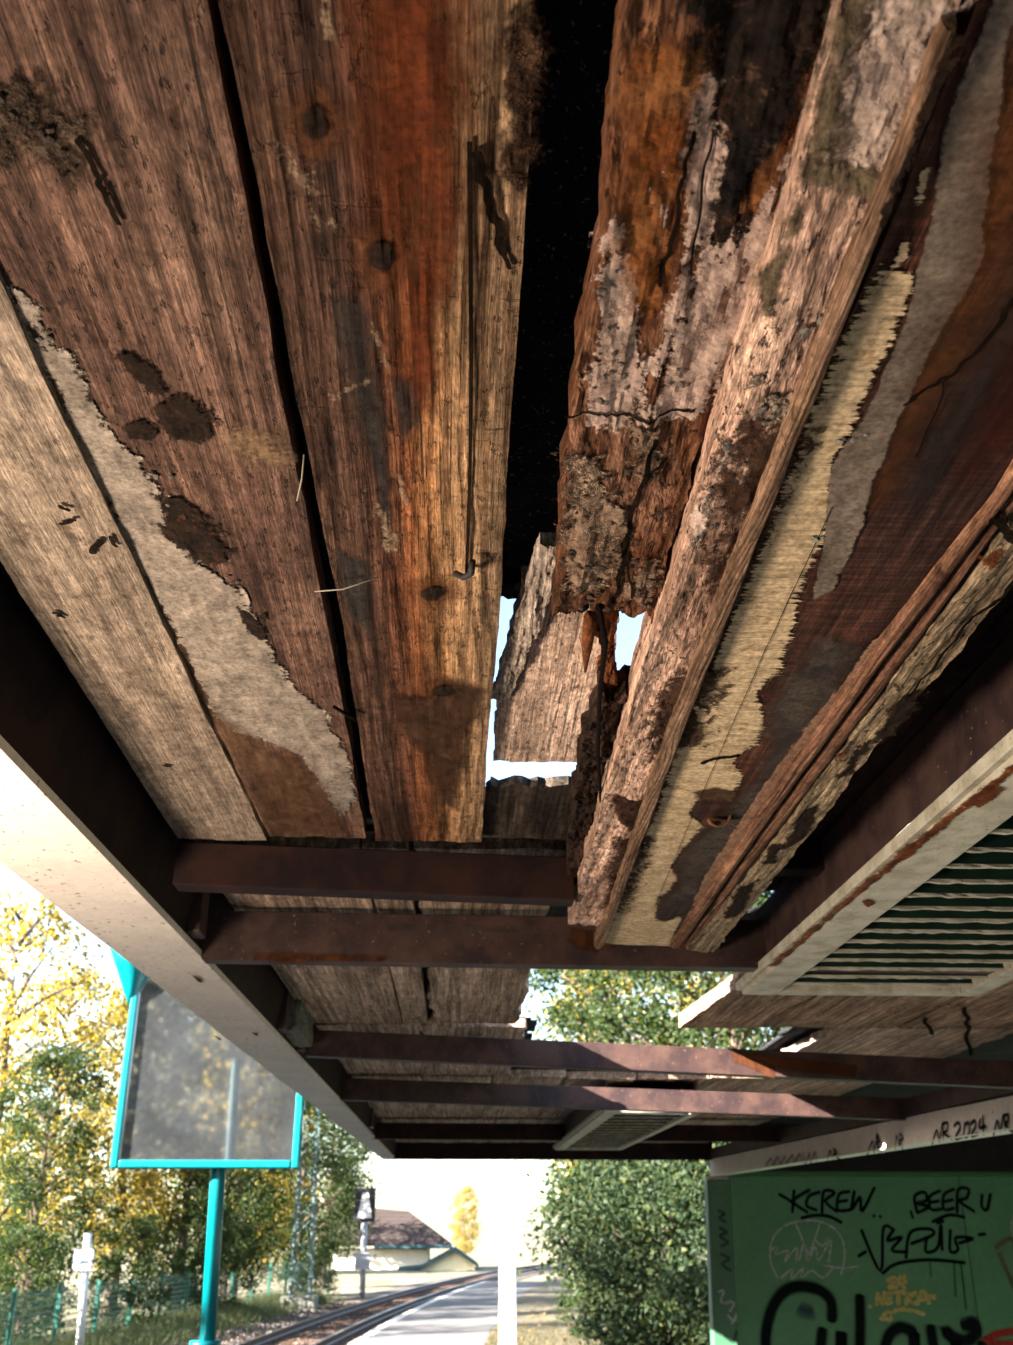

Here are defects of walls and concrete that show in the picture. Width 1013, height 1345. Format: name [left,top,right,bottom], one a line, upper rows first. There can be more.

water stain [617,45,700,319]
crack [658,129,715,287]
water stain [749,204,802,317]
water stain [733,0,879,232]
crack [903,298,1013,457]
crack [566,409,695,604]
crack [595,409,833,914]
rust [769,765,1013,967]